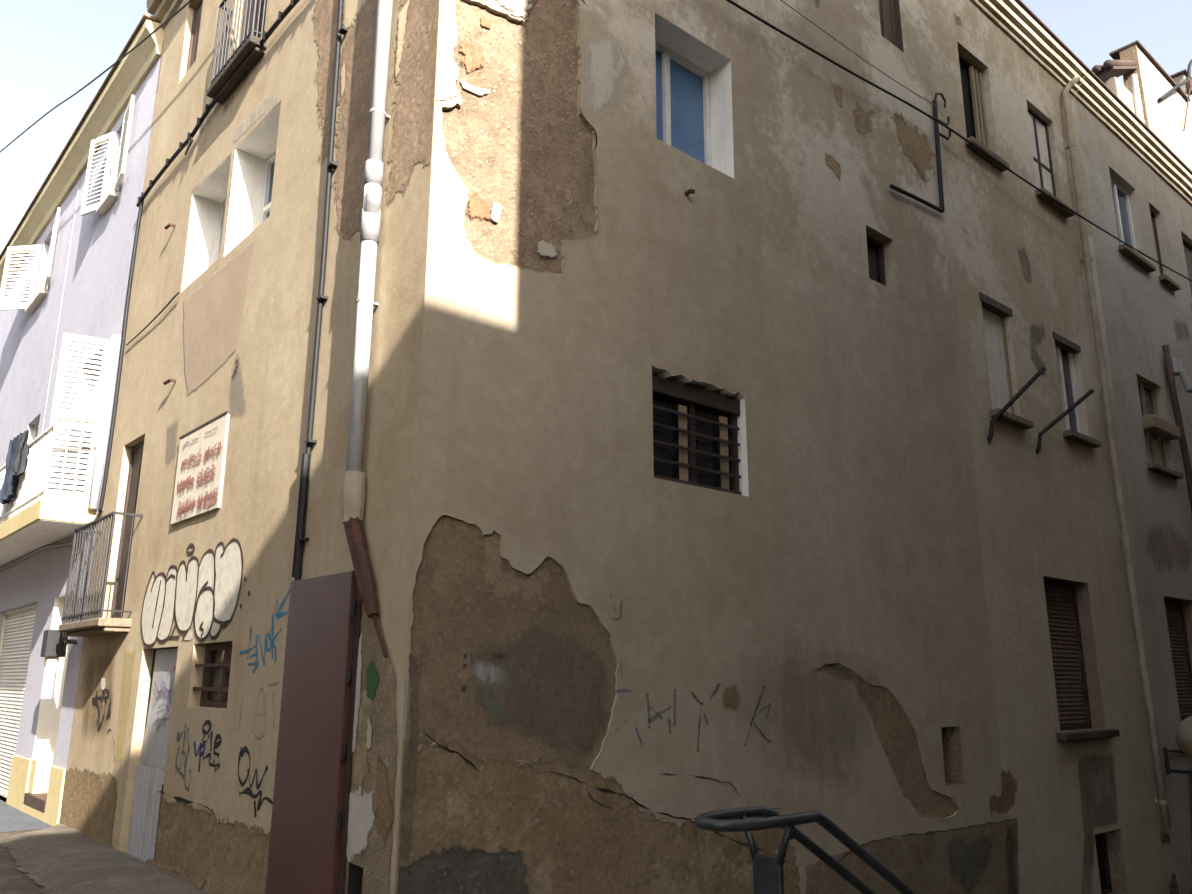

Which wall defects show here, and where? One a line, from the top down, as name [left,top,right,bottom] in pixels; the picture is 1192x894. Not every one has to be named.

peeling [312,0,377,242]
flaking render [386,0,600,274]
flaking render [59,768,118,846]
flaking render [146,798,270,894]
crack [423,731,477,770]
flaking render [345,513,801,894]
crack [539,771,790,864]
flaking render [813,662,960,819]
peeling [990,770,1017,814]